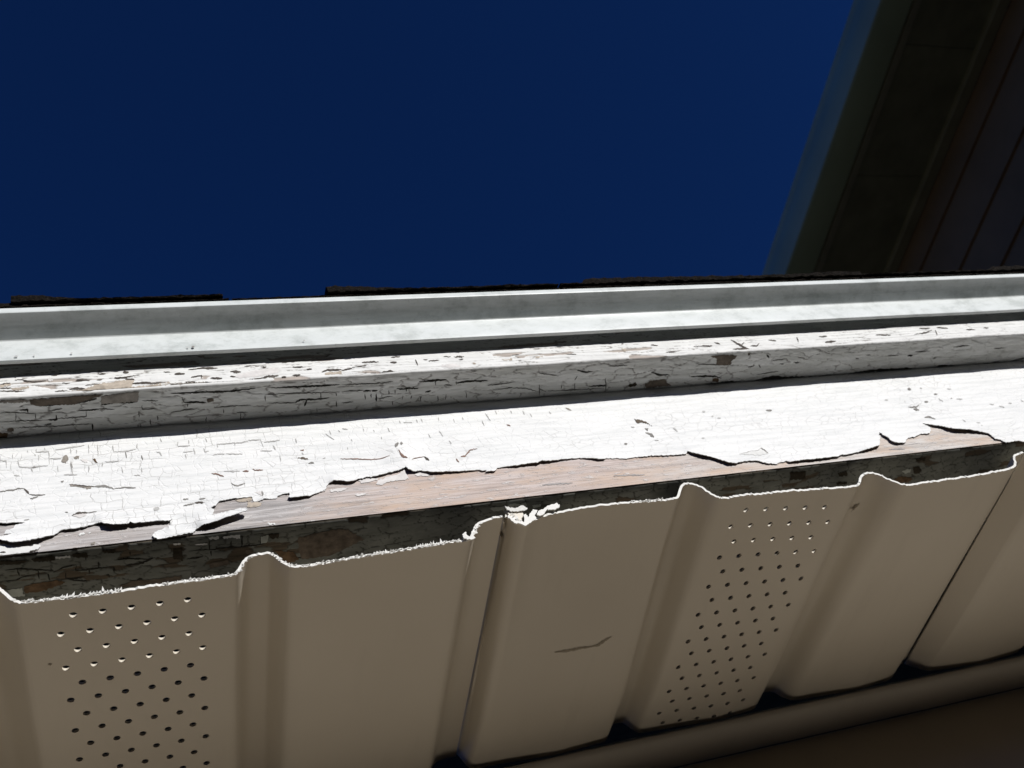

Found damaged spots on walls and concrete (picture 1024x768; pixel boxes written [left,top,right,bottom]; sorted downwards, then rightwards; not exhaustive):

peeling [711,353,750,366]
peeling [236,367,280,378]
peeling [628,379,671,388]
peeling [0,380,206,406]
crack [0,354,627,499]
peeling [0,393,1015,565]
peeling [7,580,65,597]
peeling [120,576,182,587]